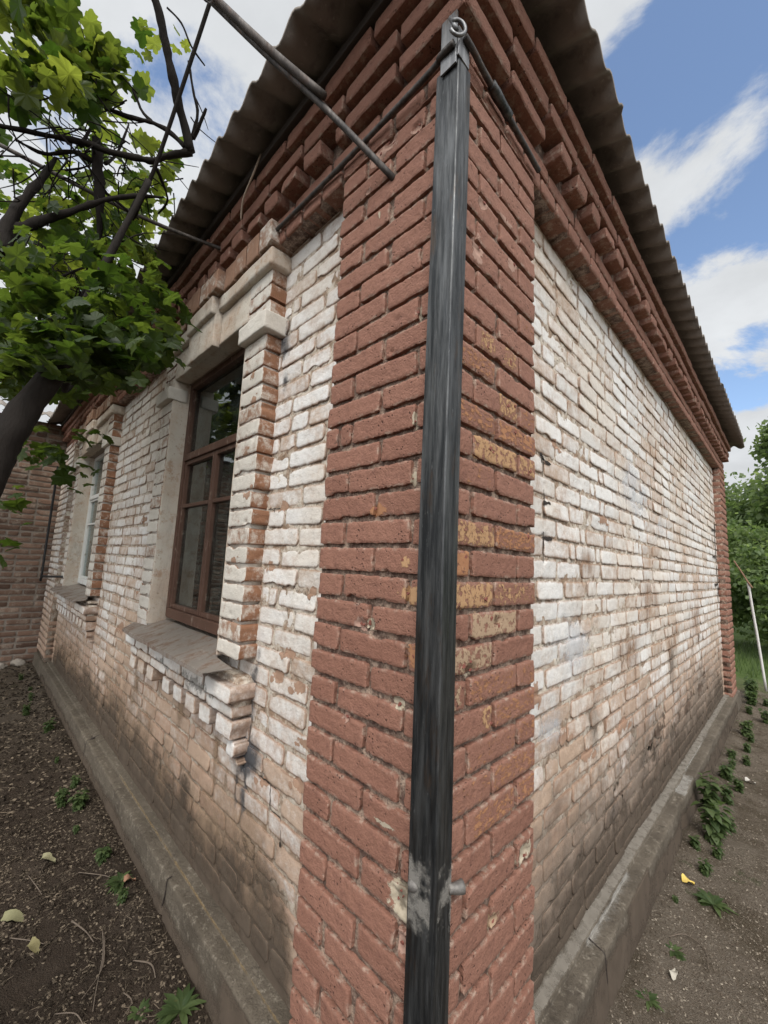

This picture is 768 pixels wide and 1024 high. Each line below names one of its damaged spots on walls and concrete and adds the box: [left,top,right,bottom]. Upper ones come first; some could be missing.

peeling [461,393,536,487]
leakage [40,641,290,1024]
spalling [387,877,408,954]
peeling [454,520,542,840]